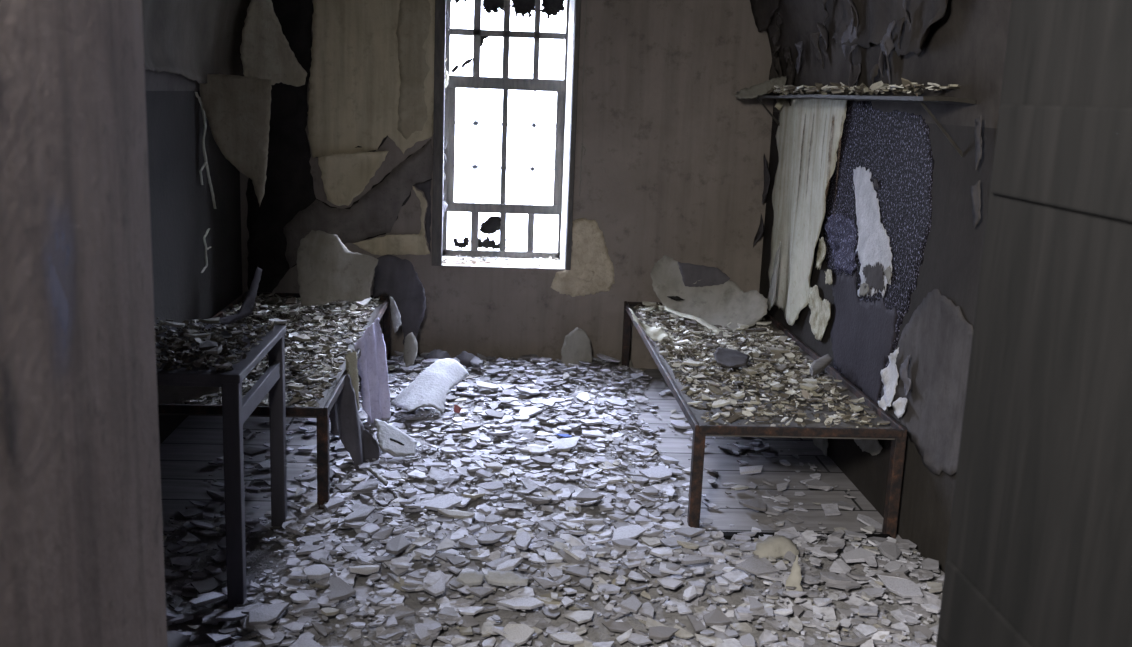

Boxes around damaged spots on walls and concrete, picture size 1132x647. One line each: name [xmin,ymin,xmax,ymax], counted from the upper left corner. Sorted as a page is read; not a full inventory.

peeling [142,0,449,292]
peeling [750,0,948,341]